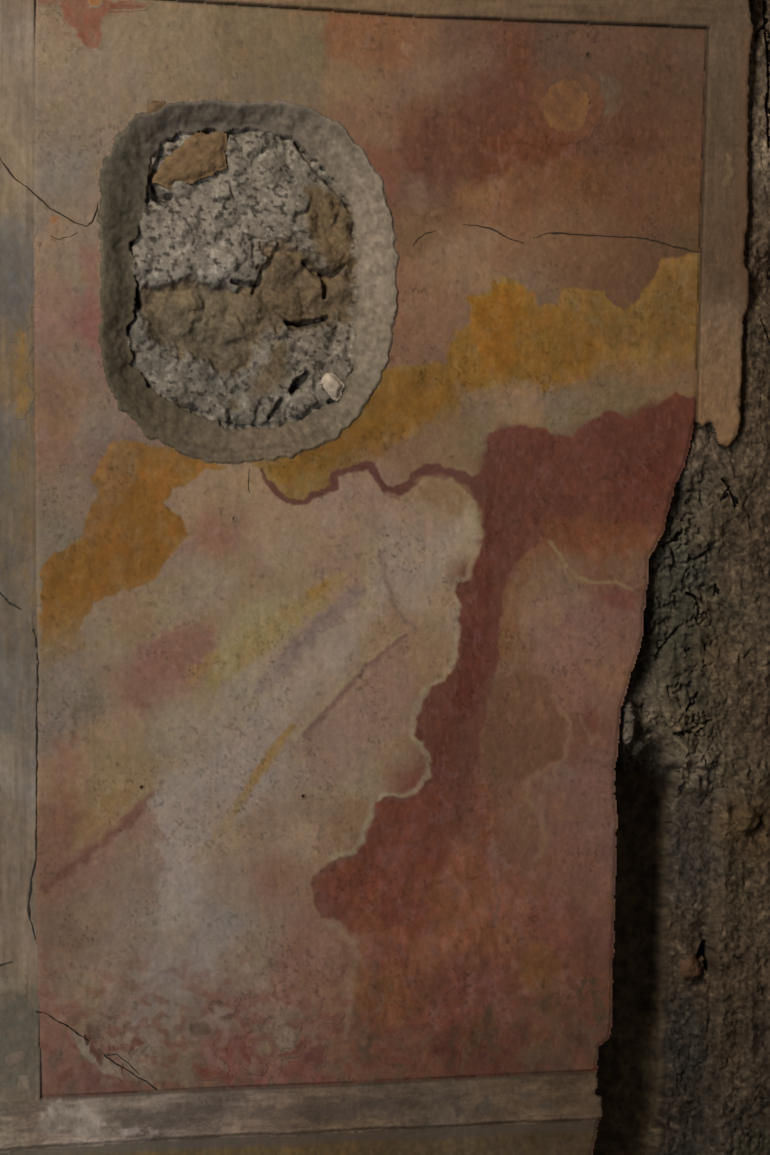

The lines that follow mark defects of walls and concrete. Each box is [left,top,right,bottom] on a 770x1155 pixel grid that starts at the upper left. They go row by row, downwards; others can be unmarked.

crack [751,0,770,144]
crack [0,158,98,240]
spalling [98,99,400,465]
crack [463,224,698,253]
flaking render [593,0,770,1155]
crack [35,1011,158,1090]